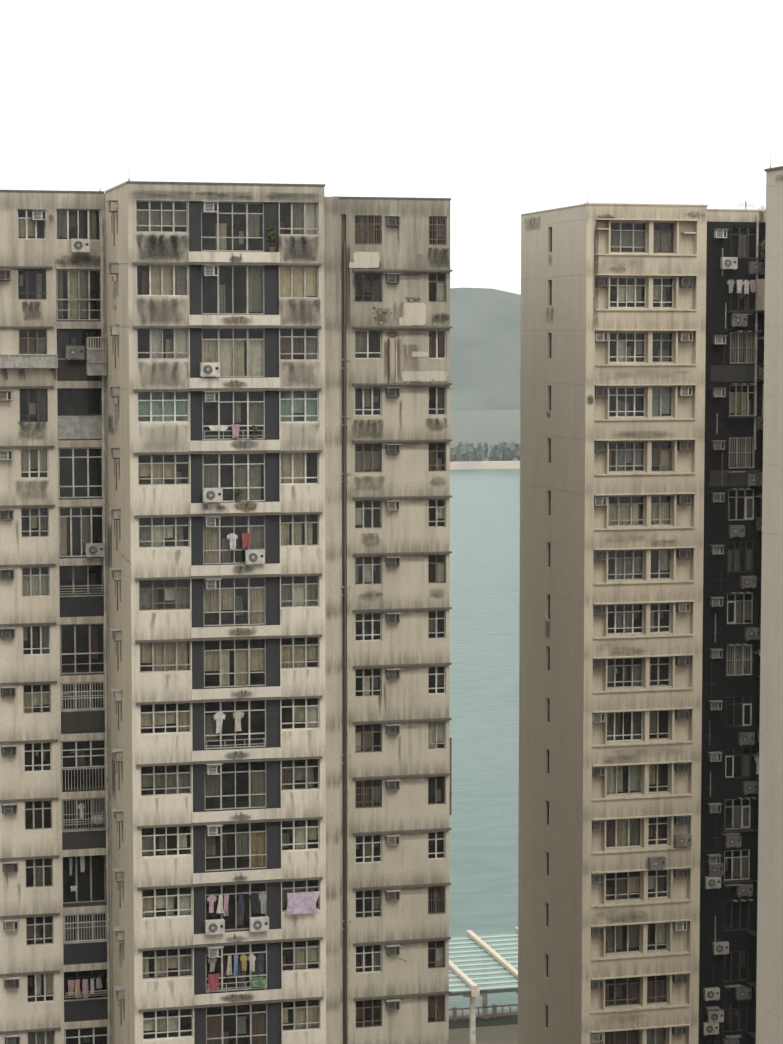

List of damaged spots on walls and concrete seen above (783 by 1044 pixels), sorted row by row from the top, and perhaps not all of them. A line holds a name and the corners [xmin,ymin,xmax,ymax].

leakage [137,236,180,258]
leakage [279,237,312,259]